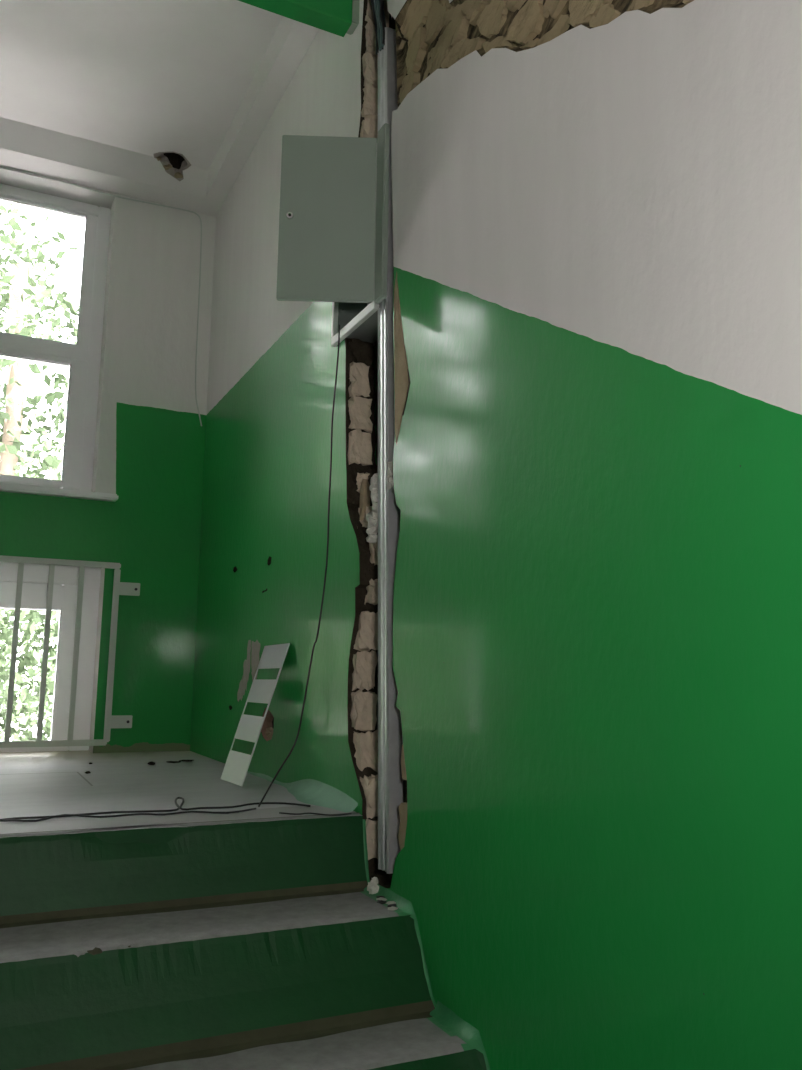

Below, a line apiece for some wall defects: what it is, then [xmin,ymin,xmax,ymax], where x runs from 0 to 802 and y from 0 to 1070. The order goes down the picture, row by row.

flaking render [395,0,694,107]
spalling [153,152,191,181]
peeling [394,272,410,446]